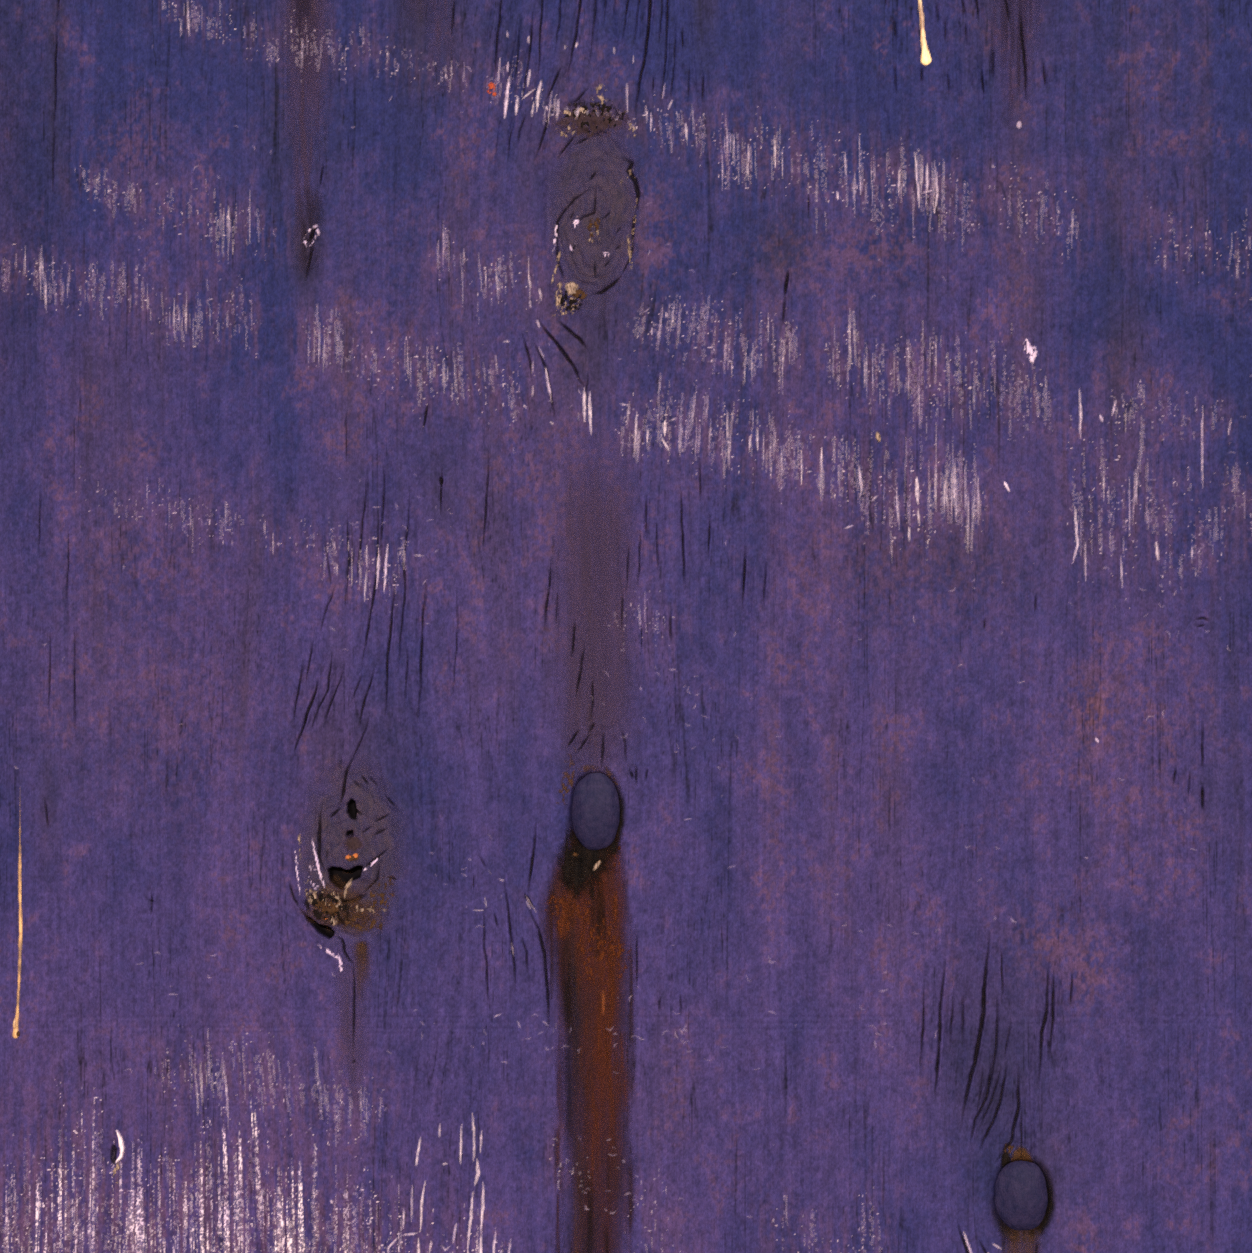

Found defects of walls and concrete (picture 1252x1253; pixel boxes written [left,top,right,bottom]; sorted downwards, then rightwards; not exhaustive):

peeling [1024,339,1037,362]
rust [549,844,632,1253]
crack [921,954,1022,1148]
crack [1040,975,1072,1059]
peeling [35,1169,94,1253]
peeling [111,1130,165,1253]
peeling [173,1118,259,1253]
peeling [264,1172,305,1253]